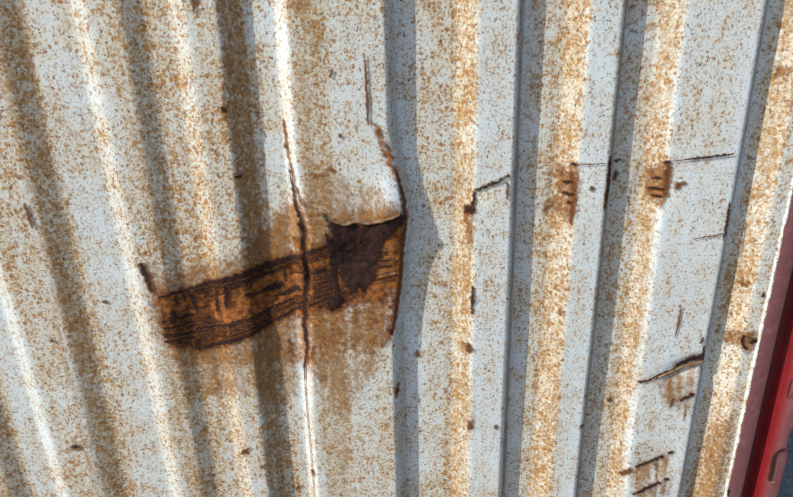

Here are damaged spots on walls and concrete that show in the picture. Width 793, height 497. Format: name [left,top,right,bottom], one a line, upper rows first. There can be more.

rust [220,0,262,250]
crack [363,54,409,347]
rust [543,163,594,225]
rust [646,163,687,207]
crack [288,169,315,497]
rust [723,330,758,355]
rust [183,339,300,497]
rust [659,366,699,421]
rust [618,454,669,496]